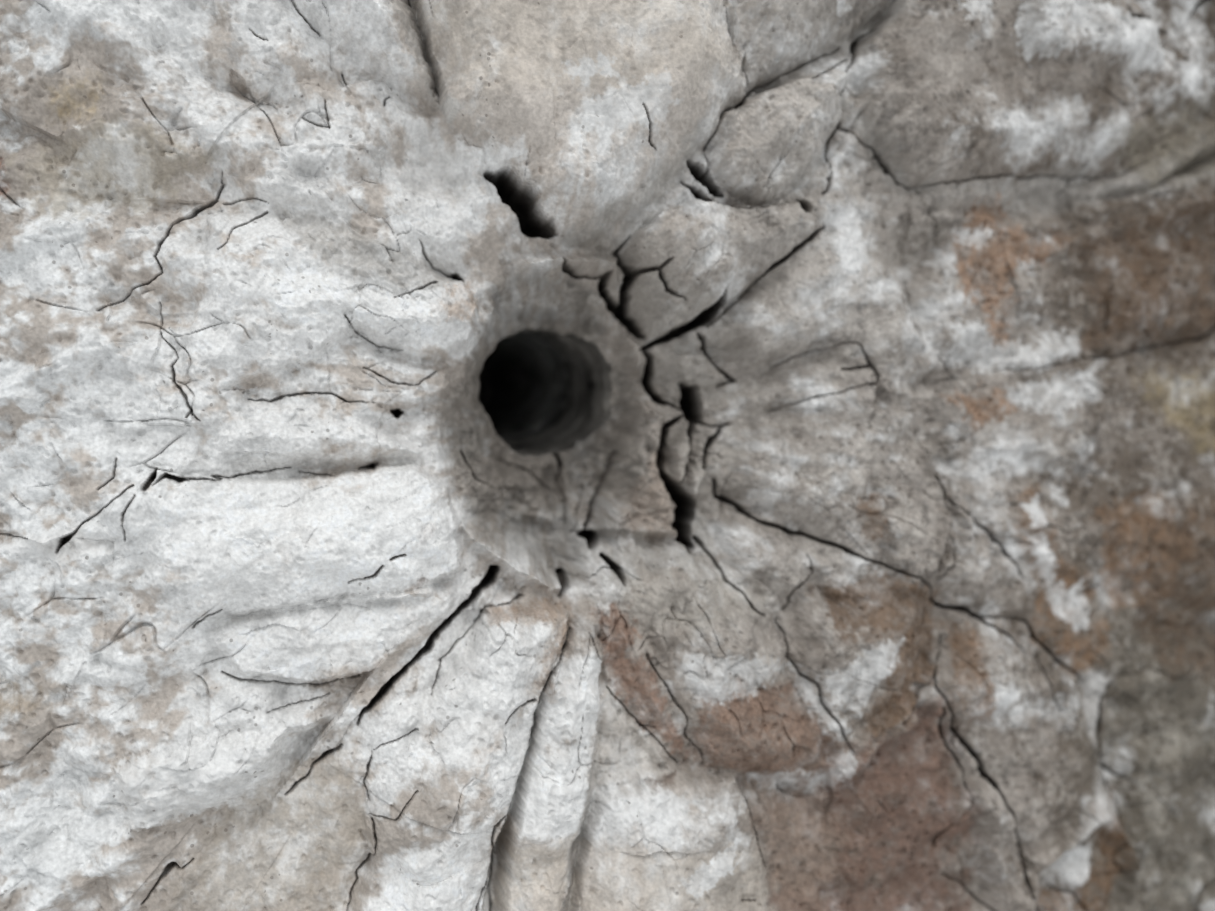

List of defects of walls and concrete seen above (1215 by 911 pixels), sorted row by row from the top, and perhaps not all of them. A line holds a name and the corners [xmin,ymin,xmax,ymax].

crack [98,171,270,422]
crack [394,241,465,299]
crack [248,315,438,419]
crack [460,0,1215,911]
crack [0,532,28,540]
crack [55,459,379,555]
crack [349,554,407,584]
crack [192,609,223,630]
crack [221,565,524,911]
crack [142,858,194,906]